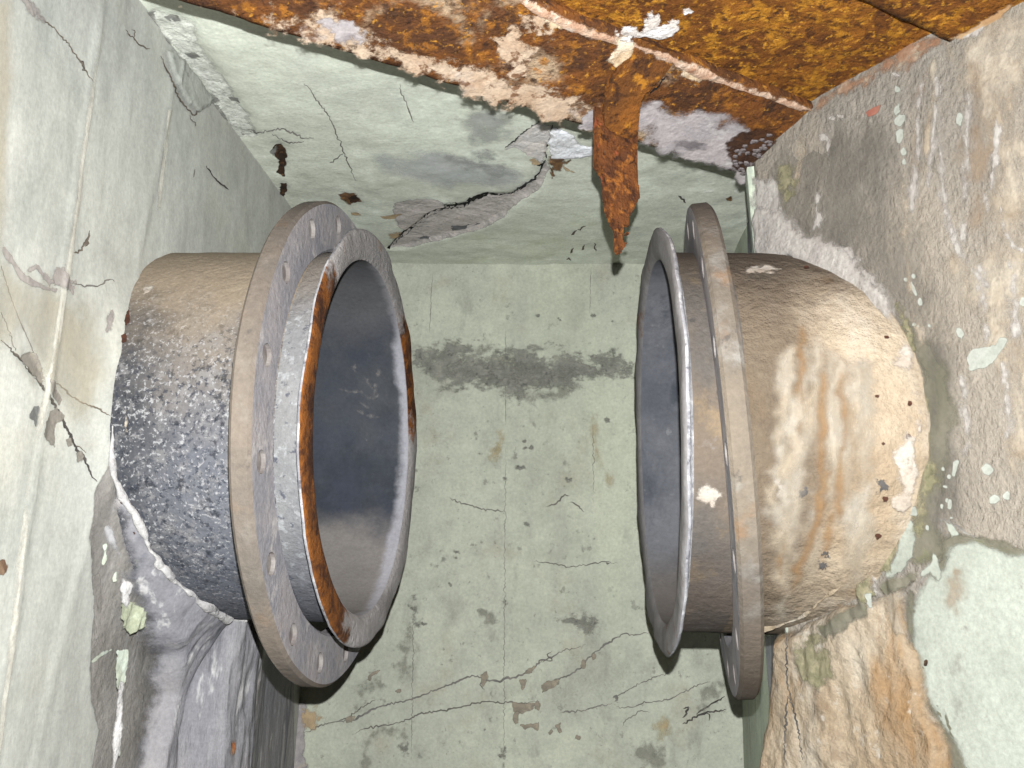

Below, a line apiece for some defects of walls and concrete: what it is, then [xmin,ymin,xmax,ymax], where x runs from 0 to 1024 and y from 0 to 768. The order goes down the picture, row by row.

flaking render [148,10,256,137]
rust [817,38,940,109]
spalling [270,144,287,196]
rust [339,192,361,215]
flaking render [381,161,550,247]
crack [387,120,553,249]
rust [548,156,574,178]
crack [74,230,90,254]
crack [1,266,115,482]
leakage [412,342,635,400]
crack [304,448,646,759]
crack [562,674,726,727]